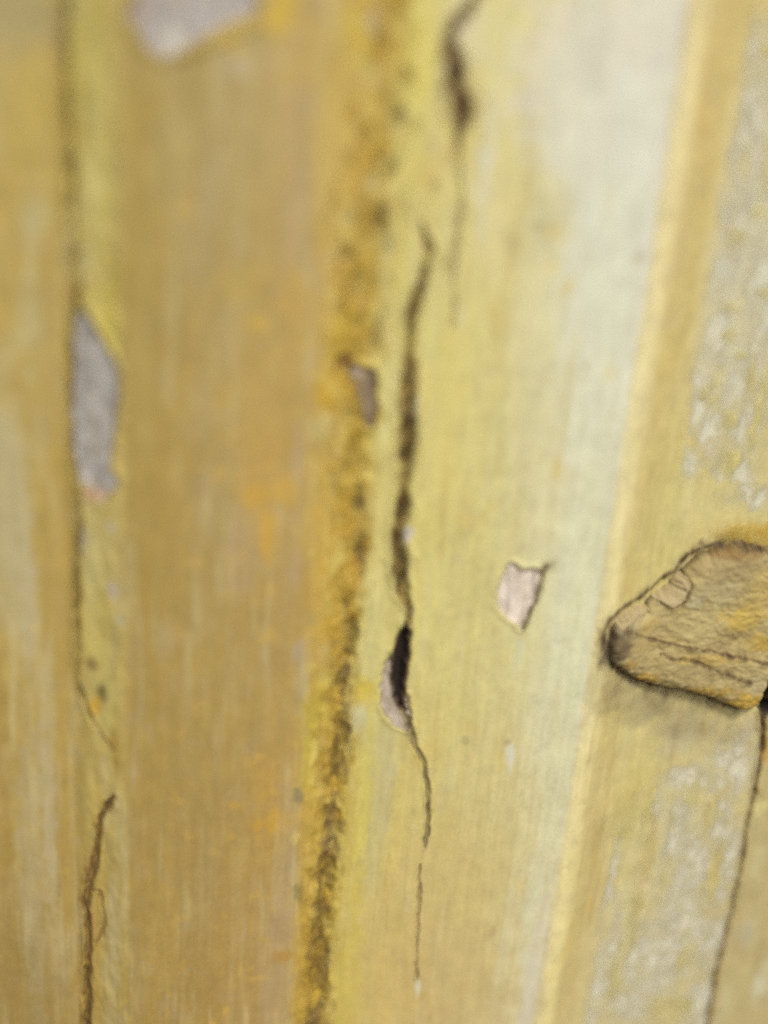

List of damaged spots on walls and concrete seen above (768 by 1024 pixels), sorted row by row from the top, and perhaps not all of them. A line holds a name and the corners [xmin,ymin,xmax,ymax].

peeling [71,286,123,505]
crack [389,0,477,979]
peeling [497,563,550,631]
crack [81,794,116,1024]
crack [705,709,767,1024]